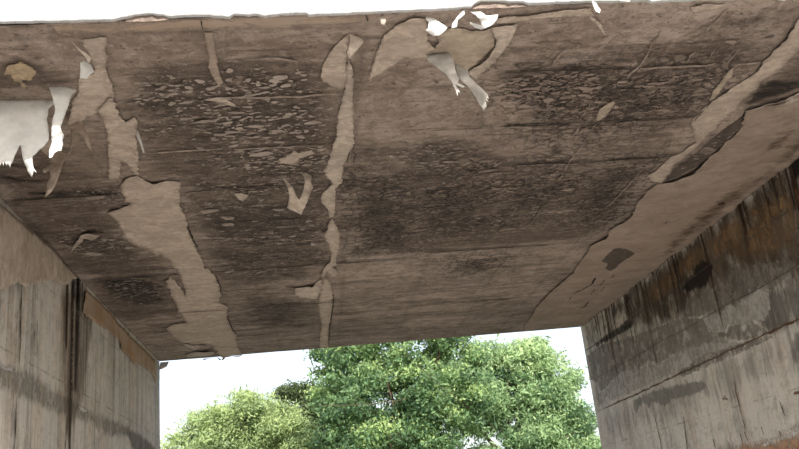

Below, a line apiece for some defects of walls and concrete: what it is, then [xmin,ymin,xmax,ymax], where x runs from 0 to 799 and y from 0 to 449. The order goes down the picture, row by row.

water stain [0,368,153,449]
peeling [0,15,386,382]
peeling [369,1,799,332]
peeling [605,342,737,400]
water stain [587,156,799,412]
rust [740,427,799,449]